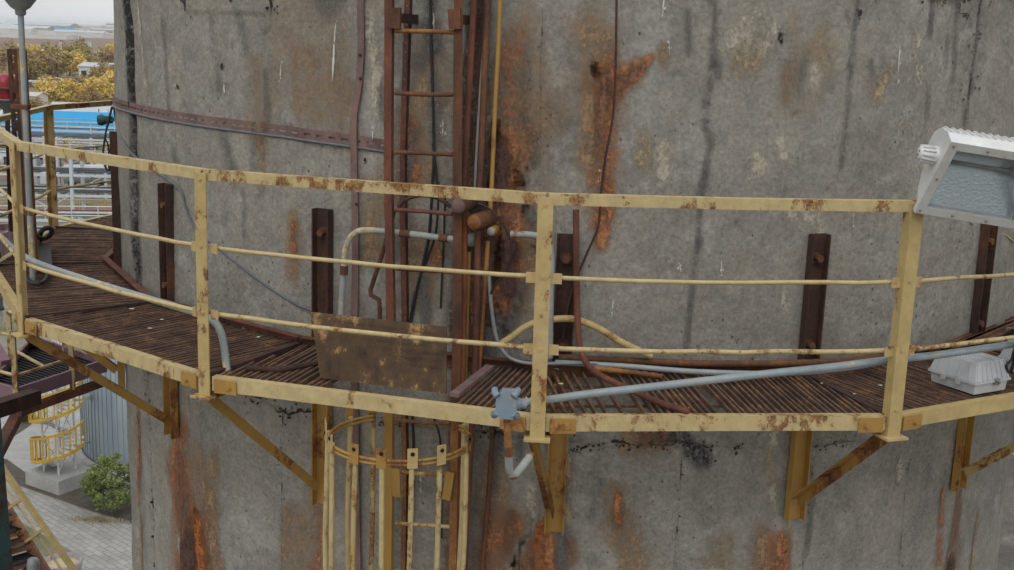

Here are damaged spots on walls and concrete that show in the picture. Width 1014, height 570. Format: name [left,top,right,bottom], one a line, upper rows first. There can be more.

water stain [364,0,384,120]
rust [575,15,668,194]
rust [591,206,613,250]
rust [166,419,224,570]
rust [519,519,577,570]
rust [754,528,791,570]
rust [937,487,962,570]